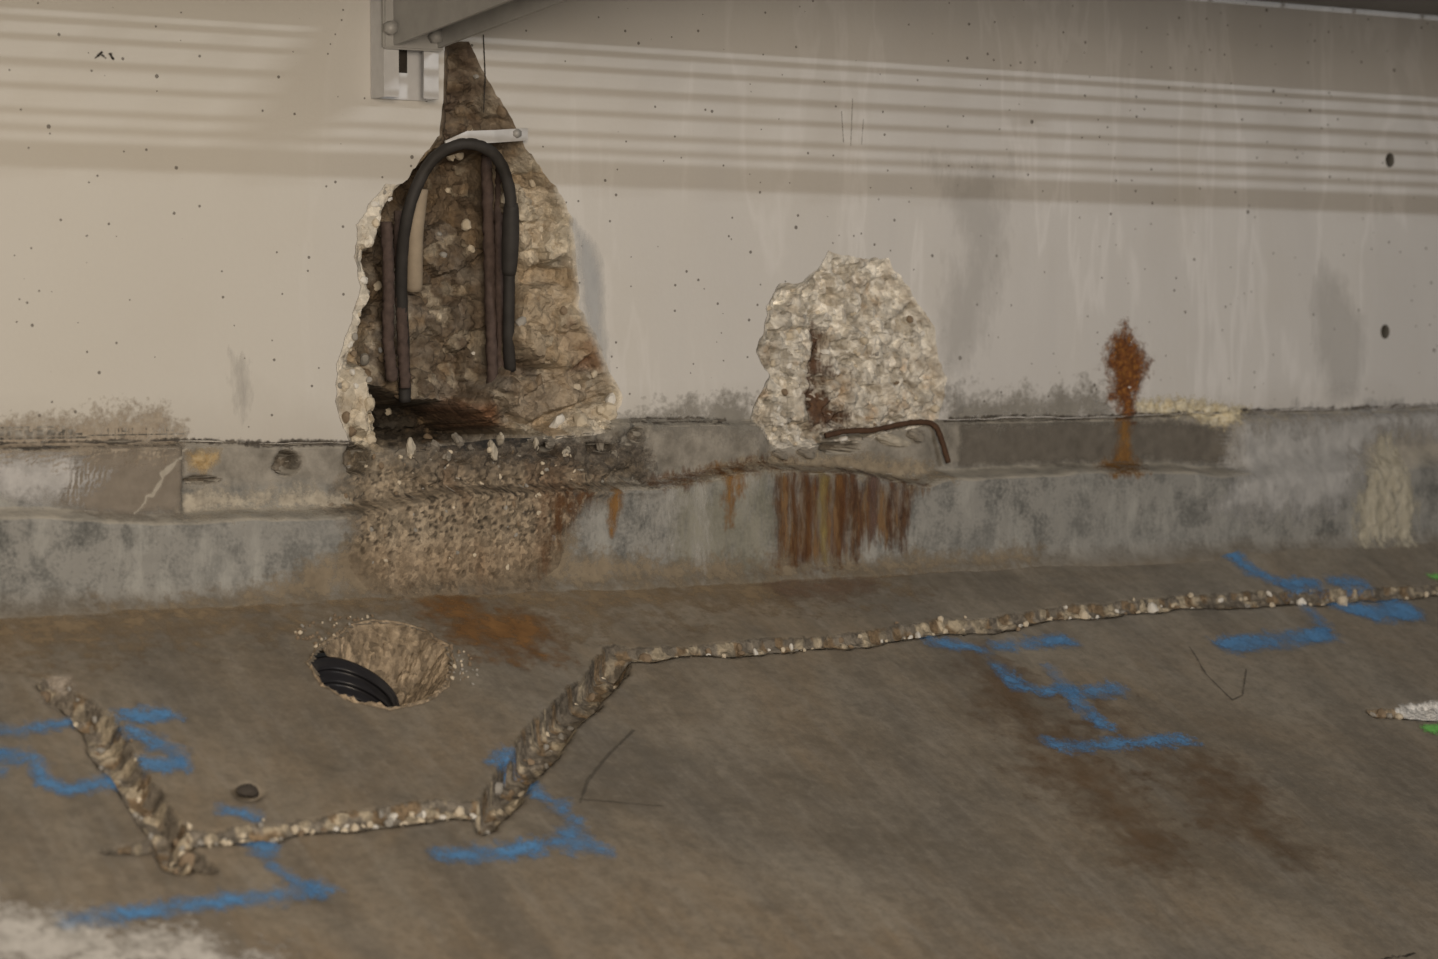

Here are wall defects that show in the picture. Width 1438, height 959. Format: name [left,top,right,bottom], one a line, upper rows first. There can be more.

spalling [335,42,658,598]
spalling [750,251,947,460]
rust [1102,321,1153,476]
rust [648,457,927,572]